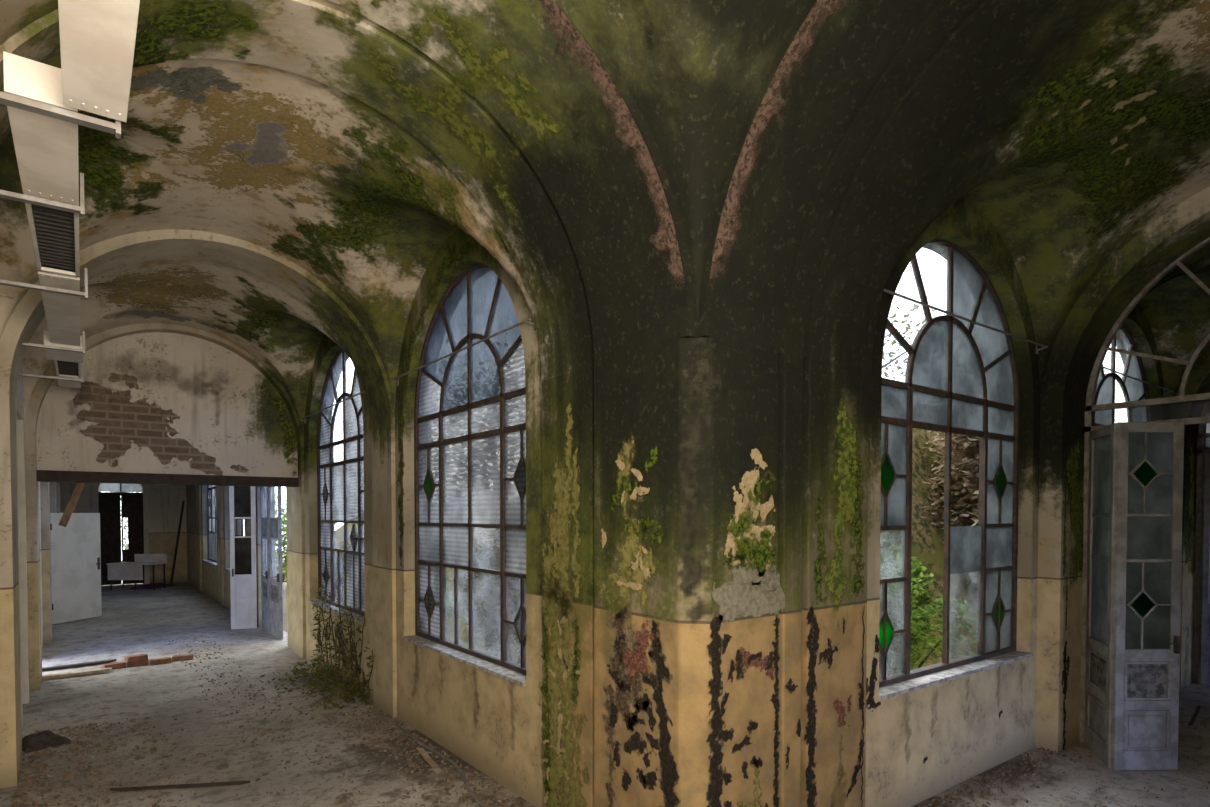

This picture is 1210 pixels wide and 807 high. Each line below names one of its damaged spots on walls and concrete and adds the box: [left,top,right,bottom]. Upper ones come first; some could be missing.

leakage [130,66,241,104]
peeling [112,63,358,239]
peeling [94,267,253,329]
flaking render [73,373,249,475]
peeling [724,448,776,585]
leakage [540,612,552,794]
peeling [541,701,570,804]
peeling [548,616,583,682]
leakage [572,621,581,704]
flaking render [602,600,681,807]
peeling [706,602,846,807]
peeling [846,738,865,797]